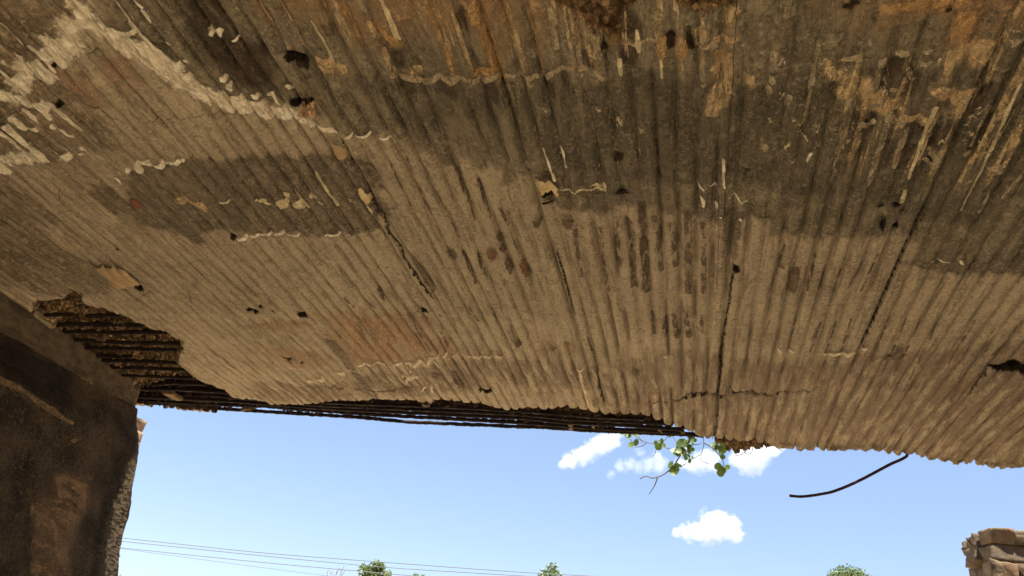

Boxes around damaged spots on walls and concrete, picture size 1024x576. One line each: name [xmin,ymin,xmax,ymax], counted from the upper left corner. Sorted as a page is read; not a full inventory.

rust [656,5,756,117]
rust [875,0,980,49]
flaking render [94,265,140,289]
spalling [331,144,348,160]
crack [328,138,441,310]
water stain [0,0,1024,298]
crack [587,0,943,434]
spalling [32,289,770,454]